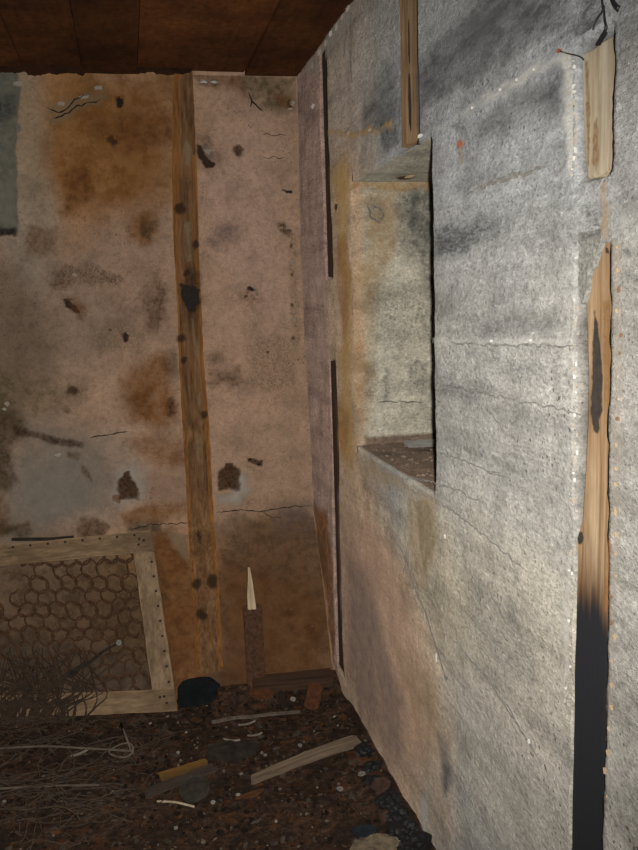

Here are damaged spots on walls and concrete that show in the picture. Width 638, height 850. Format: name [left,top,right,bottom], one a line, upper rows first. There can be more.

spalling [197,145,215,168]
crack [443,384,583,436]
crack [439,453,509,478]
crack [131,522,188,530]
crack [216,505,310,518]
crack [402,476,527,571]
crack [398,545,538,757]